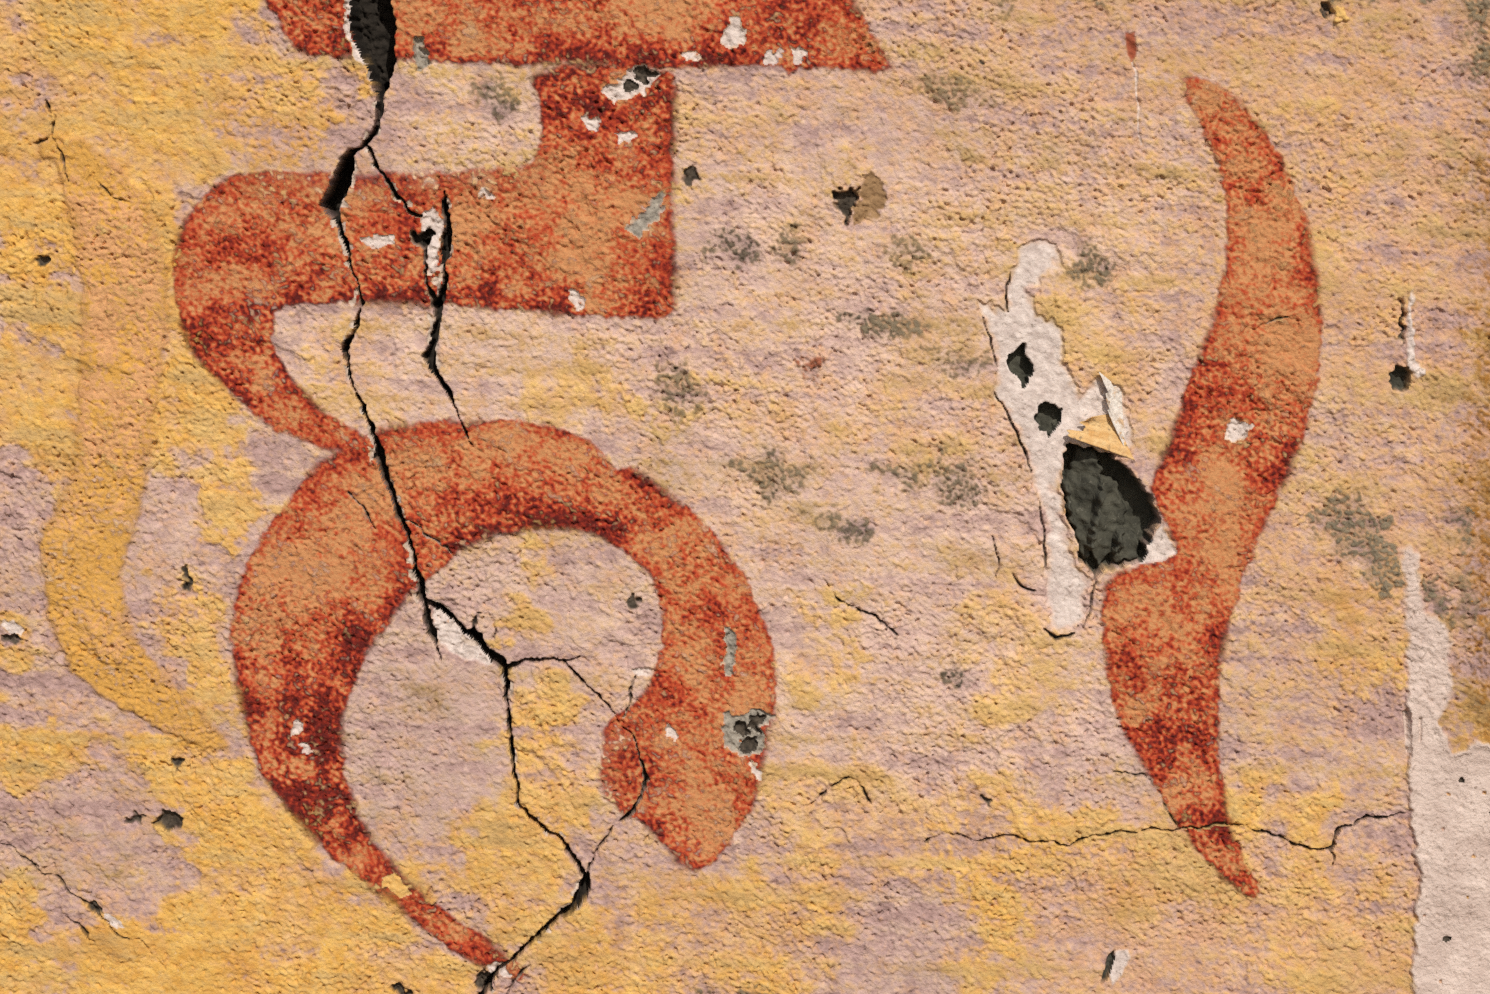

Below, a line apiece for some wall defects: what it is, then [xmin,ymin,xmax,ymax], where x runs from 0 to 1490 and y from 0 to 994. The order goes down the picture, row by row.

crack [320,0,650,994]
peeling [977,238,1178,642]
spalling [721,708,776,781]
crack [924,770,1403,873]